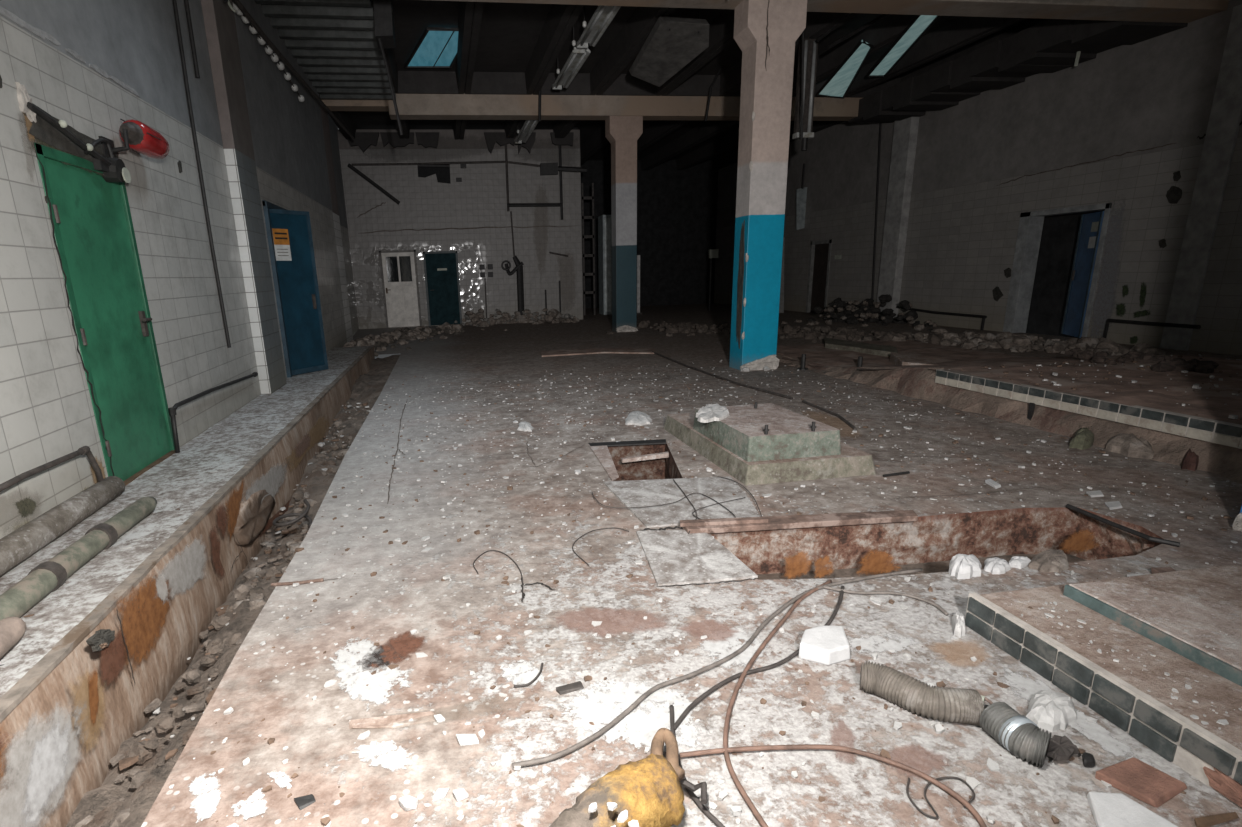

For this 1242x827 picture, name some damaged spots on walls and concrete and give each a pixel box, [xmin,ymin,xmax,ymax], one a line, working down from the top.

spalling [1166,171,1182,204]
crack [387,401,407,504]
spalling [1232,512,1242,532]
corrosion [784,551,833,579]
corrosion [856,550,900,574]
corrosion [69,573,171,750]